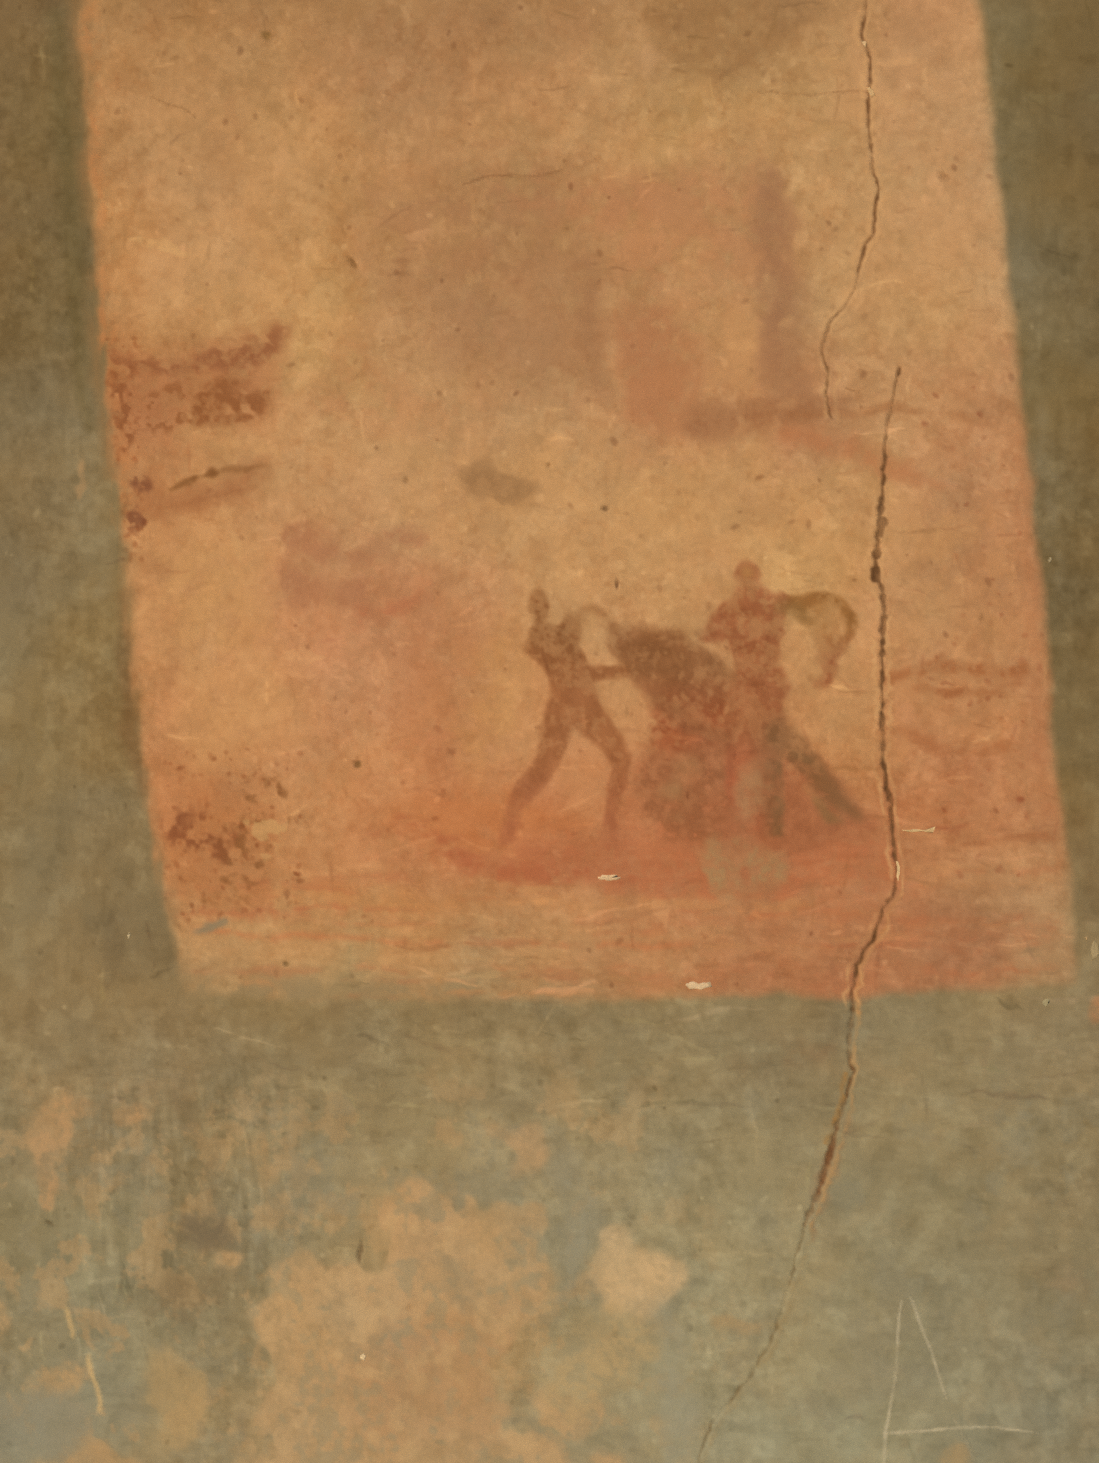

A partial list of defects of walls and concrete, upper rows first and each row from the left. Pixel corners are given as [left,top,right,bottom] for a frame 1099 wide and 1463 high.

crack [757,0,888,424]
crack [701,365,907,1463]